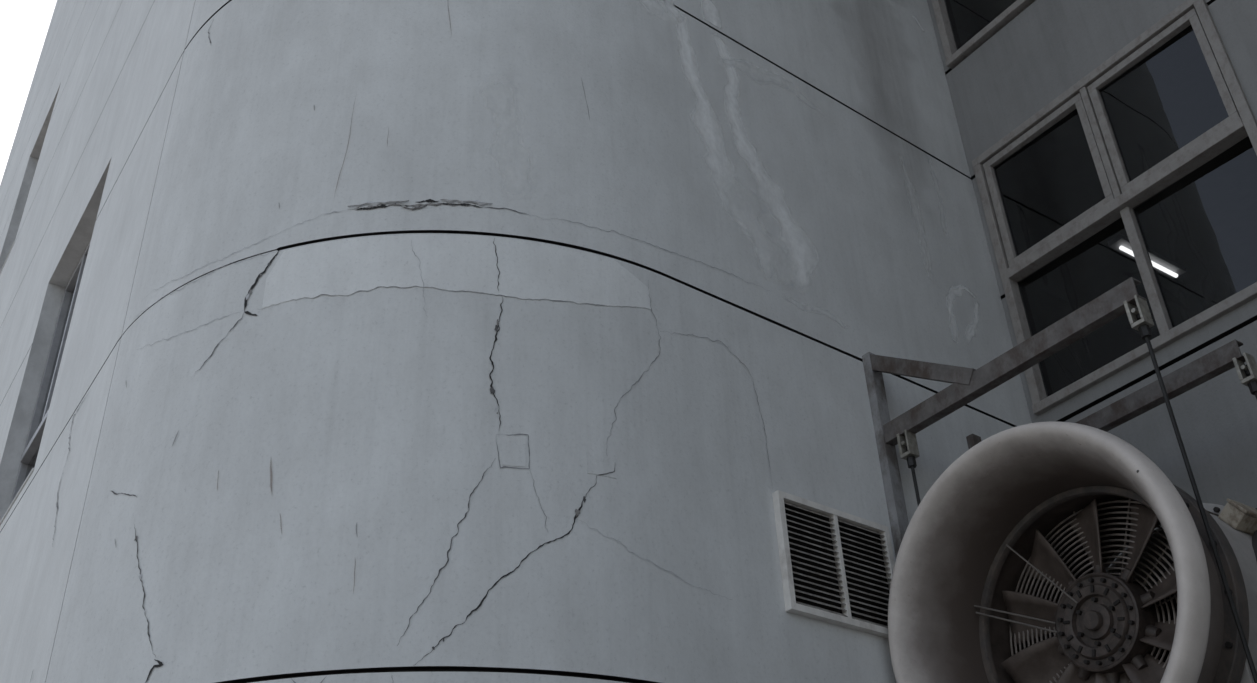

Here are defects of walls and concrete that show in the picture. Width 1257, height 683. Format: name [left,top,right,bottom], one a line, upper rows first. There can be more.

water stain [644,0,814,285]
crack [133,251,279,371]
spalling [152,199,769,291]
crack [397,238,770,666]
crack [112,491,163,683]